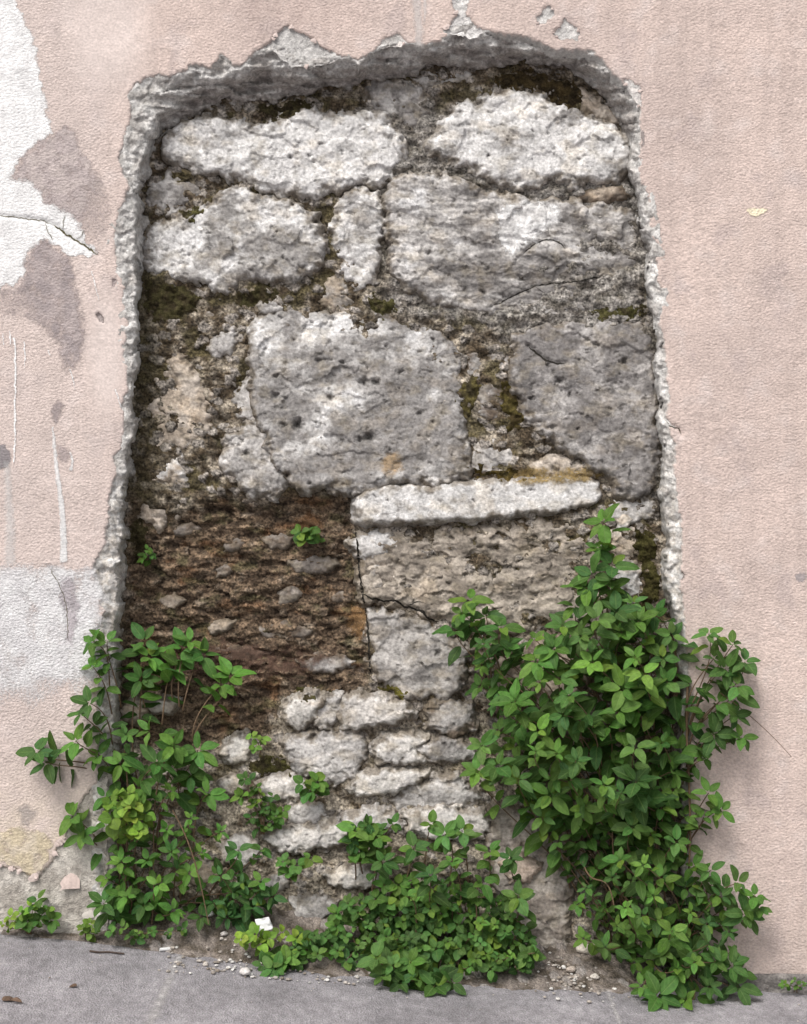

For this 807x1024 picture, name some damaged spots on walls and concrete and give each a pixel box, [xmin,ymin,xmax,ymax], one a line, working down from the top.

damp [0,239,84,367]
crack [0,215,96,254]
damp [12,125,109,232]
crack [492,277,600,306]
spalling [0,0,691,934]
crack [355,527,439,674]